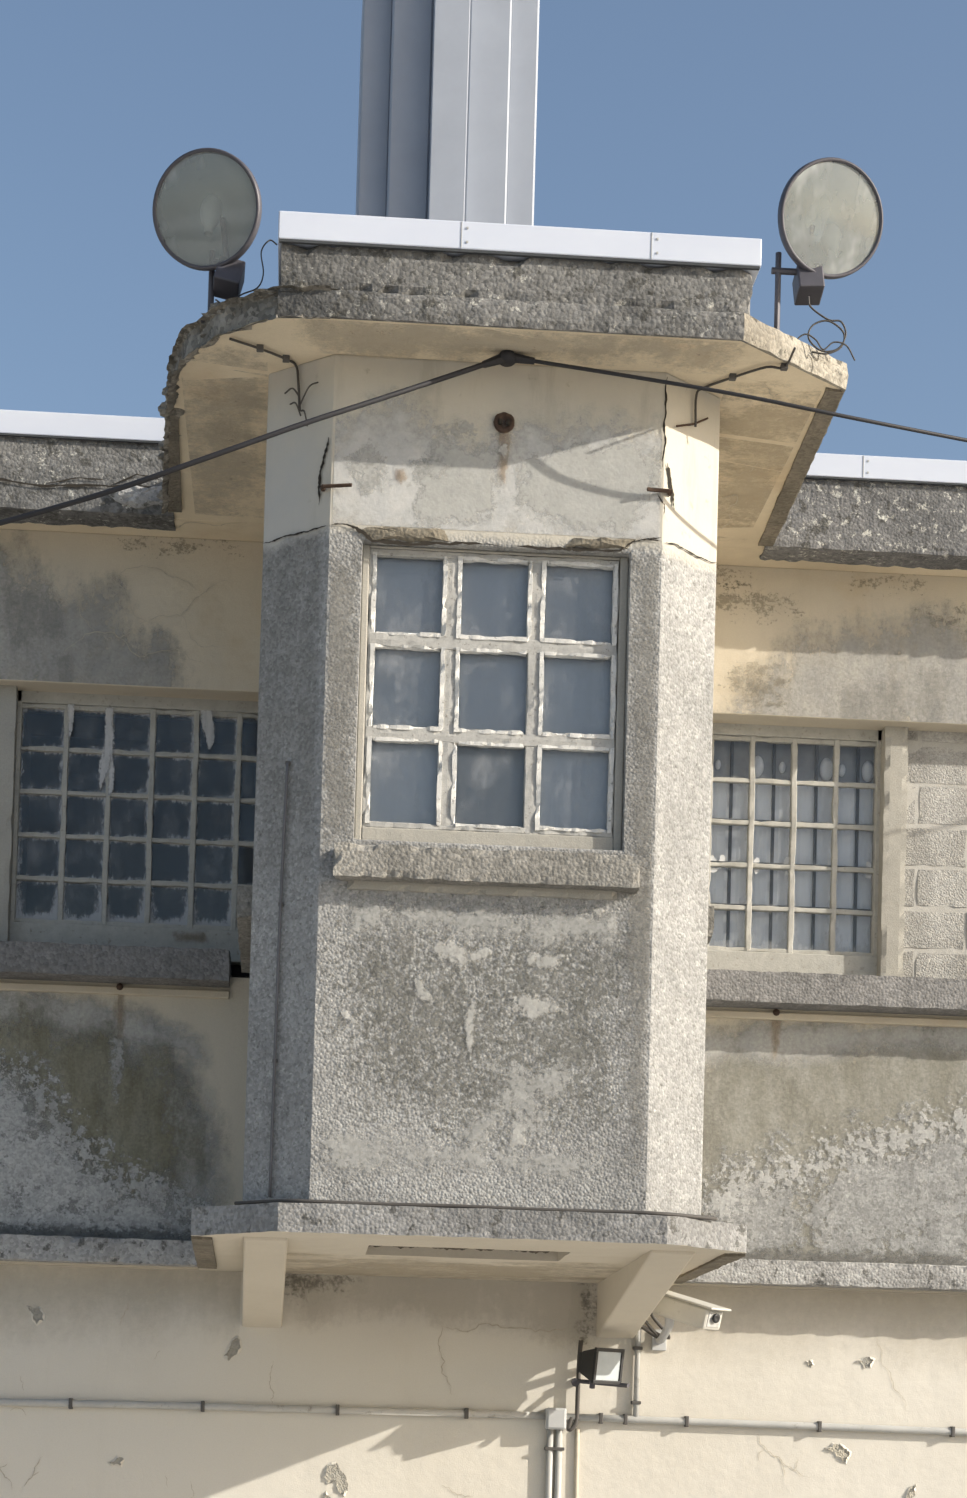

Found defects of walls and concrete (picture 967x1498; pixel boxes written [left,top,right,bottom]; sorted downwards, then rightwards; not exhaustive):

spalling [109,285,339,514]
peeling [333,399,662,552]
crack [634,377,757,563]
leakage [0,551,175,687]
leakage [736,613,967,724]
leakage [0,991,217,1241]
peeling [321,1462,348,1498]
peeling [825,1442,852,1465]